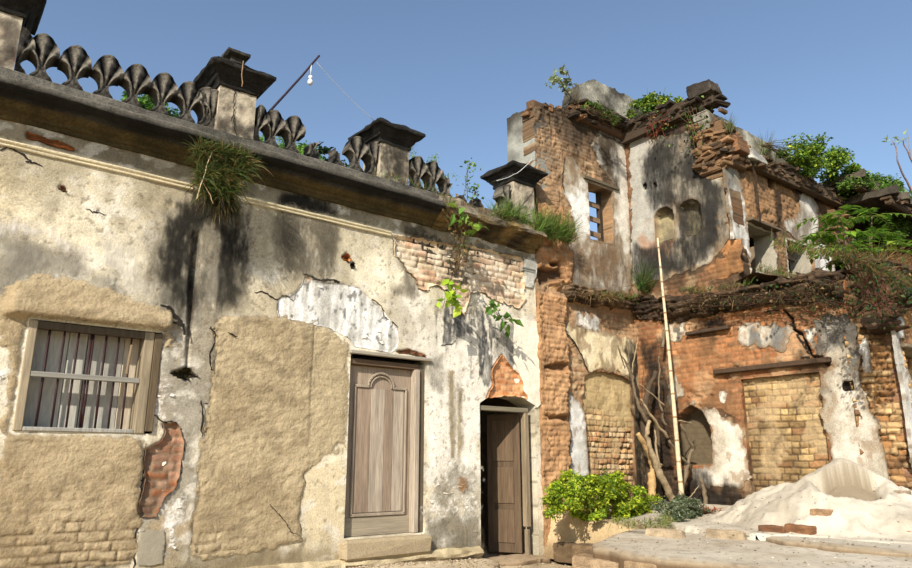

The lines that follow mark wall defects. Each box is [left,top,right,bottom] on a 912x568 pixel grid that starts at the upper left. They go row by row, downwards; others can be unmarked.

crack [0,147,43,167]
damp [578,131,723,287]
damp [154,192,247,314]
spalling [393,236,526,316]
crack [160,304,186,335]
crack [209,326,238,371]
peeling [277,276,427,357]
spalling [486,355,528,399]
crack [765,309,831,364]
spalling [138,368,198,556]